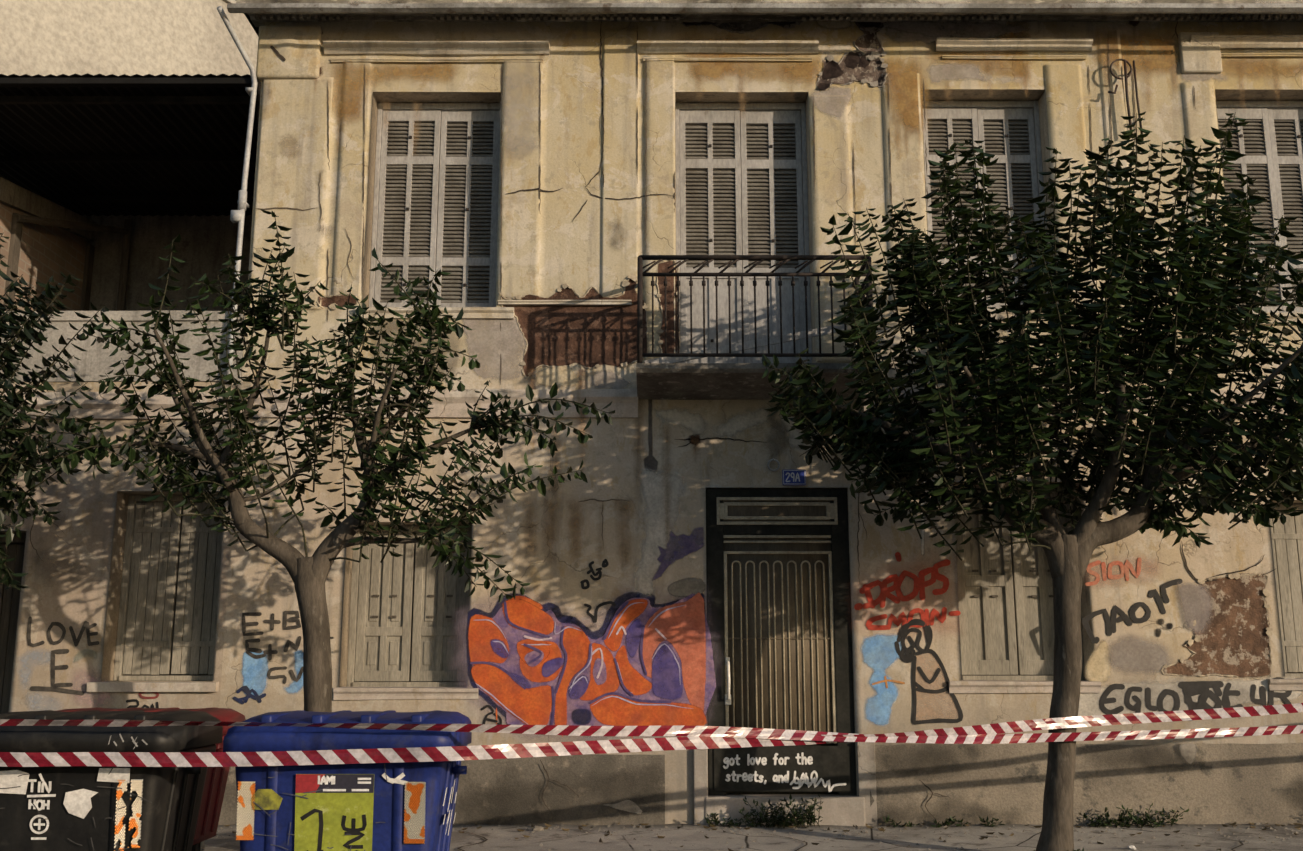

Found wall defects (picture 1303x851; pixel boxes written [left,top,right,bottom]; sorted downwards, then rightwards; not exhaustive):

crack [507,21,672,220]
spalling [816,21,891,90]
leakage [887,61,925,138]
spalling [499,260,681,379]
crack [676,437,767,447]
spalling [1078,573,1302,716]